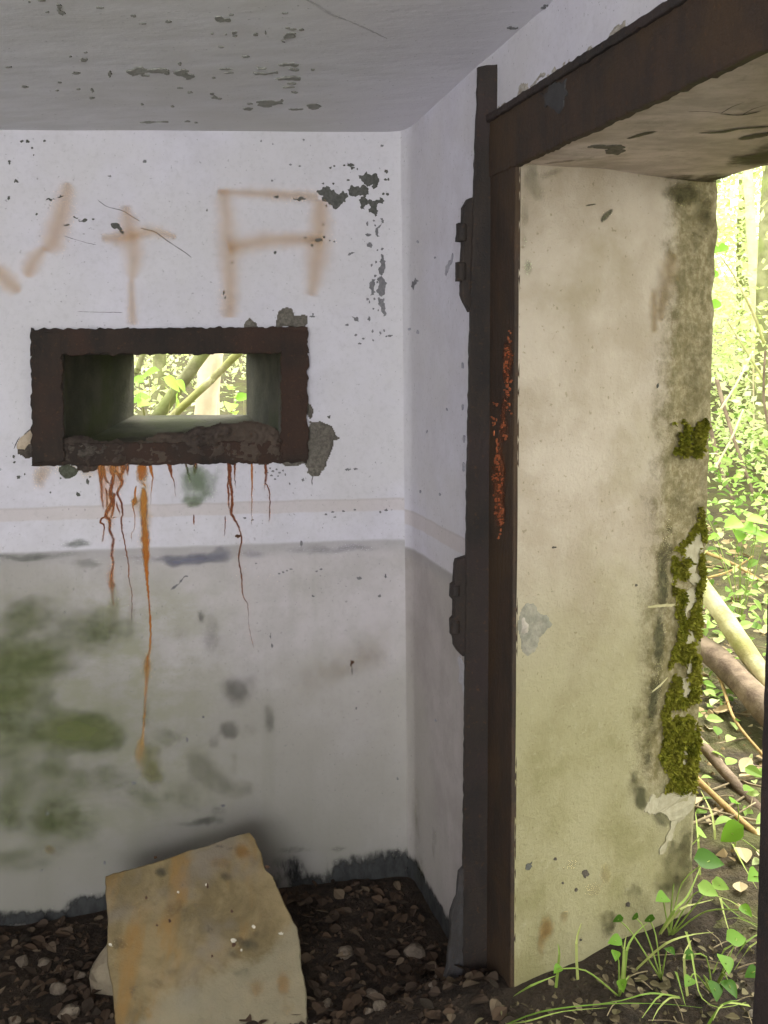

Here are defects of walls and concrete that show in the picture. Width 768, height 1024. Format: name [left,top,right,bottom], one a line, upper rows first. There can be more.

peeling [126,62,195,94]
peeling [242,55,321,111]
peeling [293,163,393,345]
spalling [13,429,32,463]
spalling [267,403,340,485]
rust [490,330,513,539]
rust [251,464,271,519]
rust [97,464,154,694]
rust [224,463,249,616]
spalling [518,603,552,656]
damp [0,894,107,926]
damp [289,850,449,940]